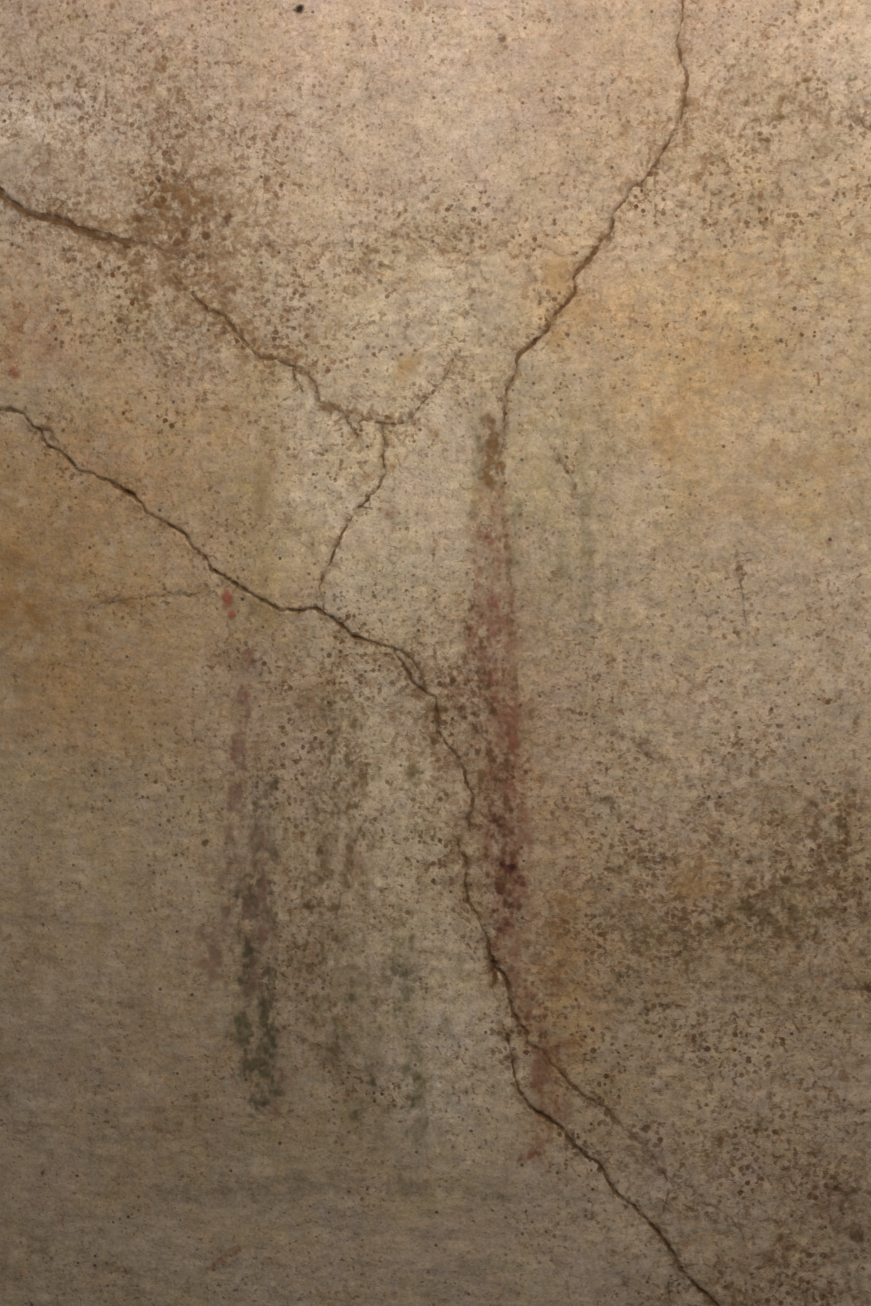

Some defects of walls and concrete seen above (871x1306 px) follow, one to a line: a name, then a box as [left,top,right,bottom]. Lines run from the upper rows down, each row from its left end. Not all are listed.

crack [0,187,718,1306]
crack [502,0,689,428]